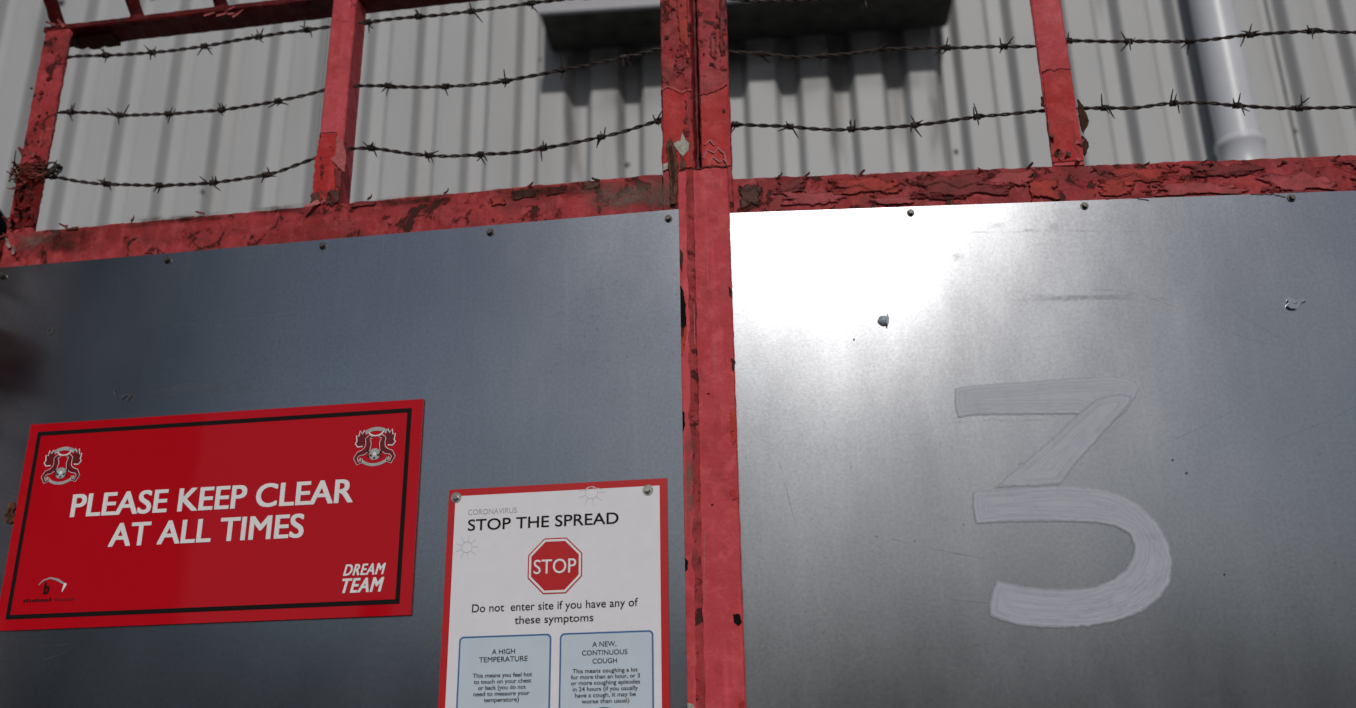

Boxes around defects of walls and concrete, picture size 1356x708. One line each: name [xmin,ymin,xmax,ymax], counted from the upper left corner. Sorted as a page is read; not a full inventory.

peeling [0,111,48,254]
peeling [488,177,601,205]
peeling [662,0,731,171]
peeling [738,162,1061,211]
peeling [1042,68,1356,200]